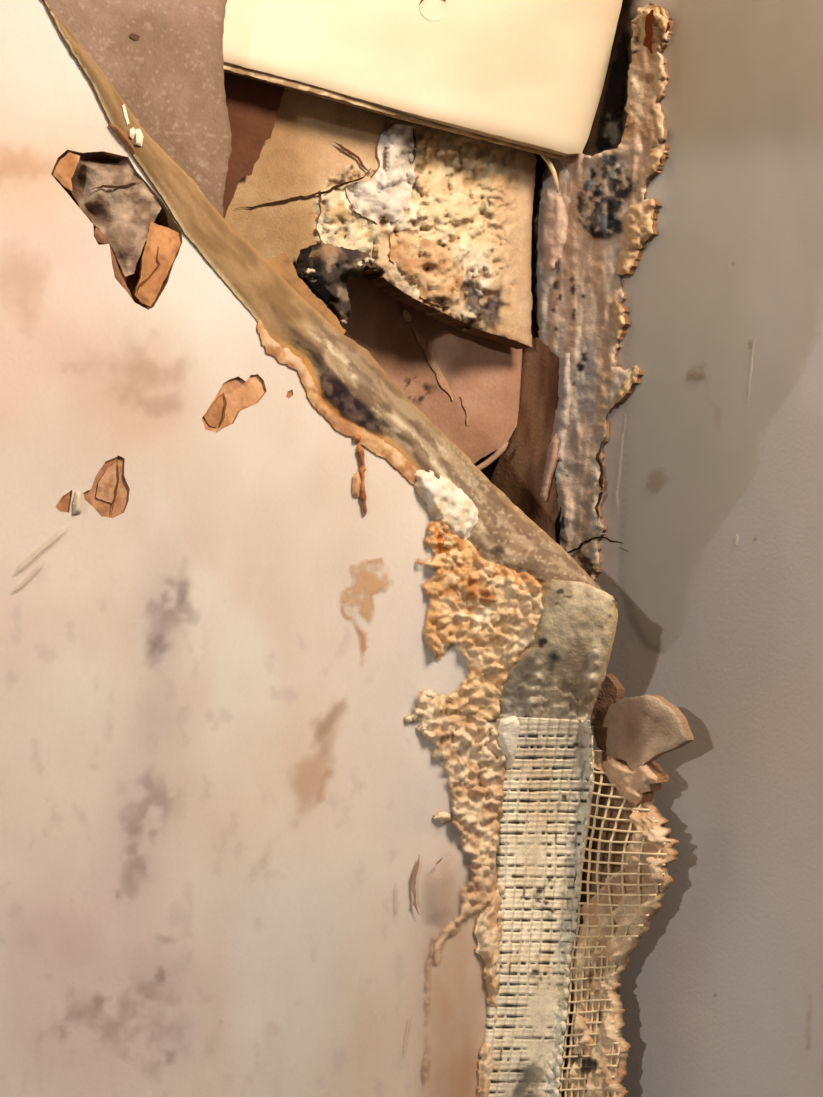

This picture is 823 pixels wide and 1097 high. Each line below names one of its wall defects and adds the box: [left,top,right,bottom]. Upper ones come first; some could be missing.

crack [235,142,371,209]
crack [410,128,418,163]
leakage [577,0,634,239]
peeling [645,144,670,179]
spalling [225,87,537,349]
peeling [616,198,662,276]
leakage [552,260,585,311]
peeling [613,299,630,340]
peeling [202,375,265,432]
leakage [298,342,384,433]
peeling [611,368,644,407]
spalling [593,694,694,769]